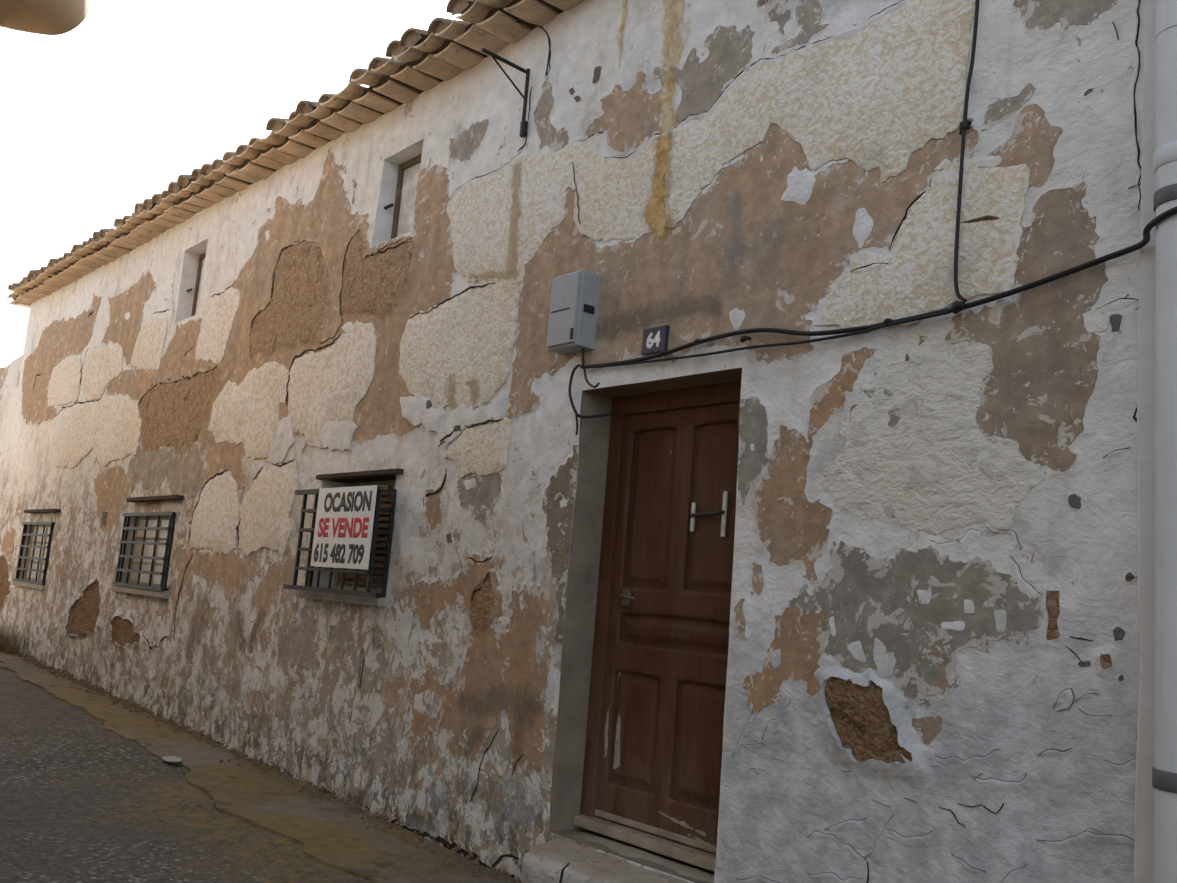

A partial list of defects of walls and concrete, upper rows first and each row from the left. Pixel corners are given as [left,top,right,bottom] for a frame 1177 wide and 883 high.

rust [643,0,689,240]
crack [1111,0,1141,210]
peeling [21,111,497,536]
peeling [506,73,1126,513]
spalling [64,568,149,660]
damp [186,591,207,660]
peeling [374,435,579,789]
peeling [730,336,1131,792]
crack [1052,633,1112,725]
crack [559,863,570,883]
crack [735,875,780,883]
crack [806,748,1135,883]